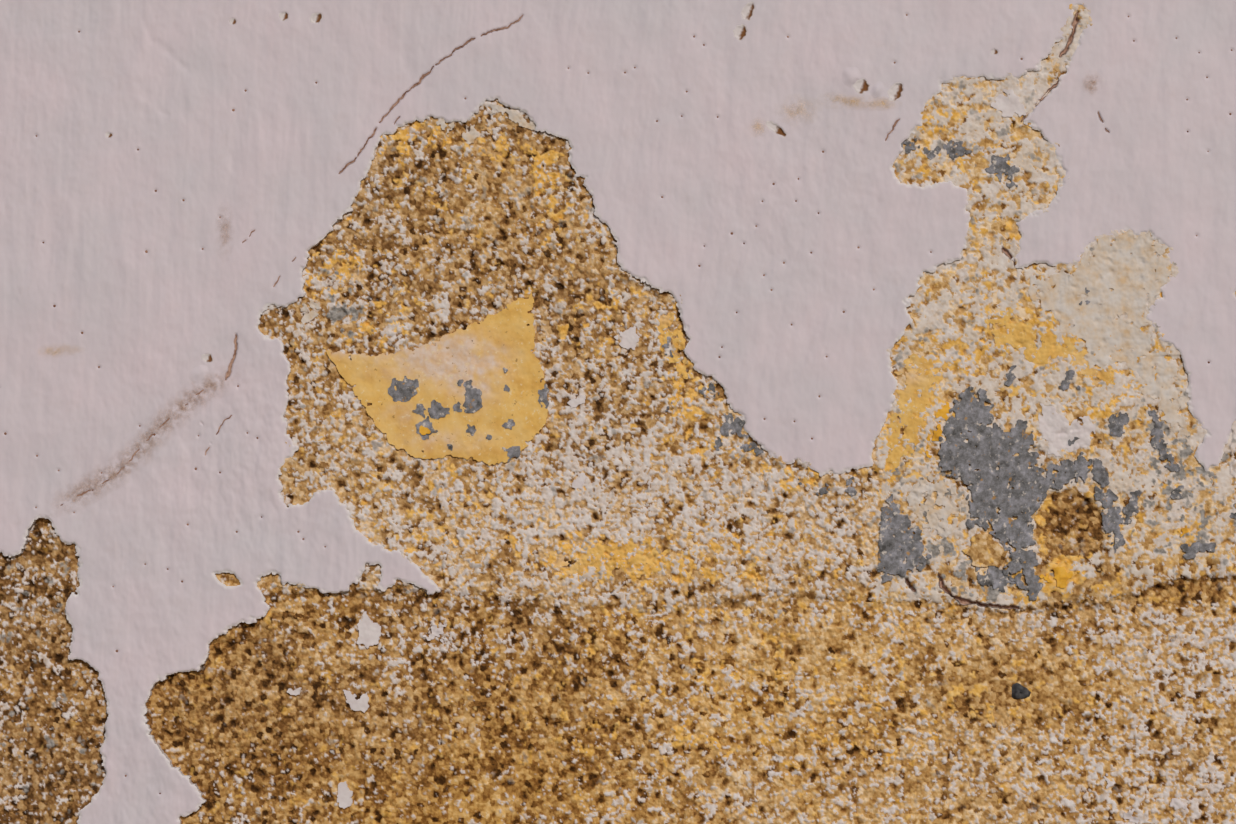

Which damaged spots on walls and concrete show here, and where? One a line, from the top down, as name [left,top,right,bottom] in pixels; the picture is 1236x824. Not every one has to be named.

flaking render [258,2,1236,612]
flaking render [0,518,108,824]
flaking render [145,563,1236,824]